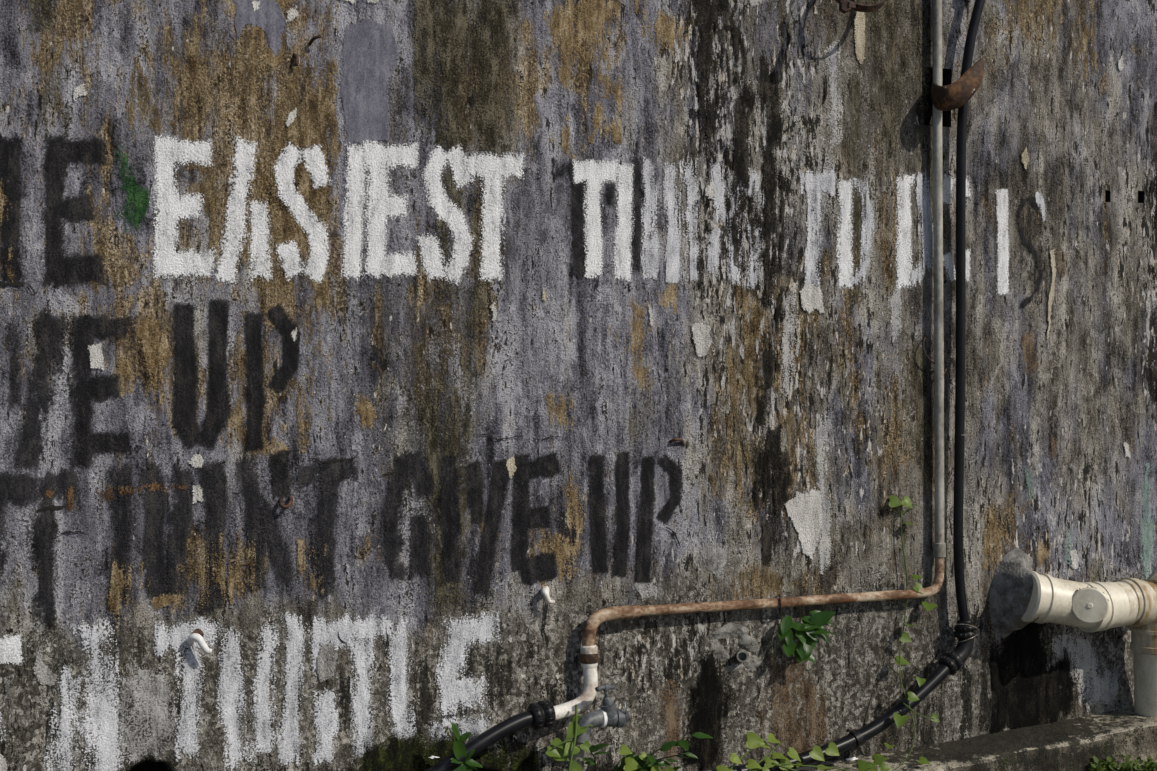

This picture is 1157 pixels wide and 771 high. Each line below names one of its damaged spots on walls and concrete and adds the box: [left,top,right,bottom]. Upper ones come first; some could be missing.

leakage [1147,102,1157,242]
crack [0,281,38,294]
peeling [692,323,711,357]
leakage [692,0,800,566]
peeling [705,280,825,559]
efflorescence [812,415,833,575]
leakage [1137,462,1157,580]
leakage [985,622,1121,734]